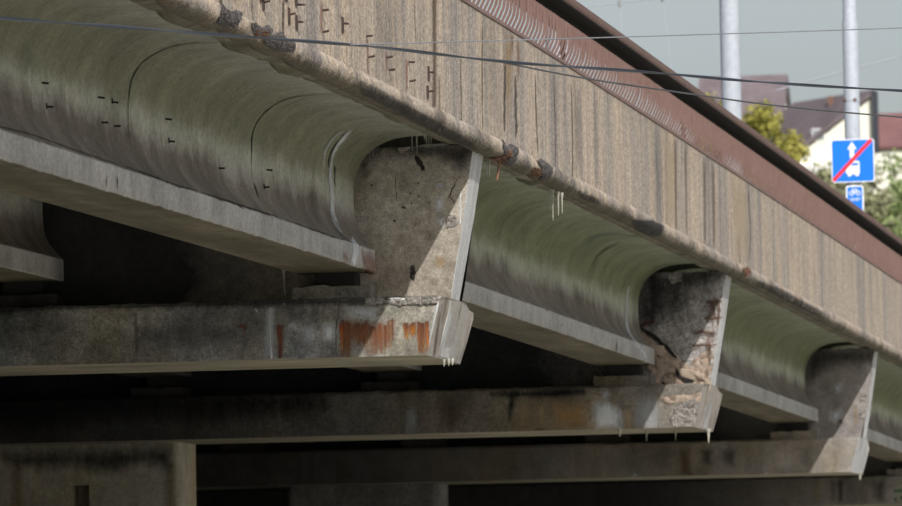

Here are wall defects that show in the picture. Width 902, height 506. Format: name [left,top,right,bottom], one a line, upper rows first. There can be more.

spalling [217,4,296,52]
spalling [490,140,519,166]
spalling [532,159,553,181]
corrosion [340,319,393,357]
corrosion [404,308,442,354]
spalling [640,298,723,427]
leakage [597,392,630,428]